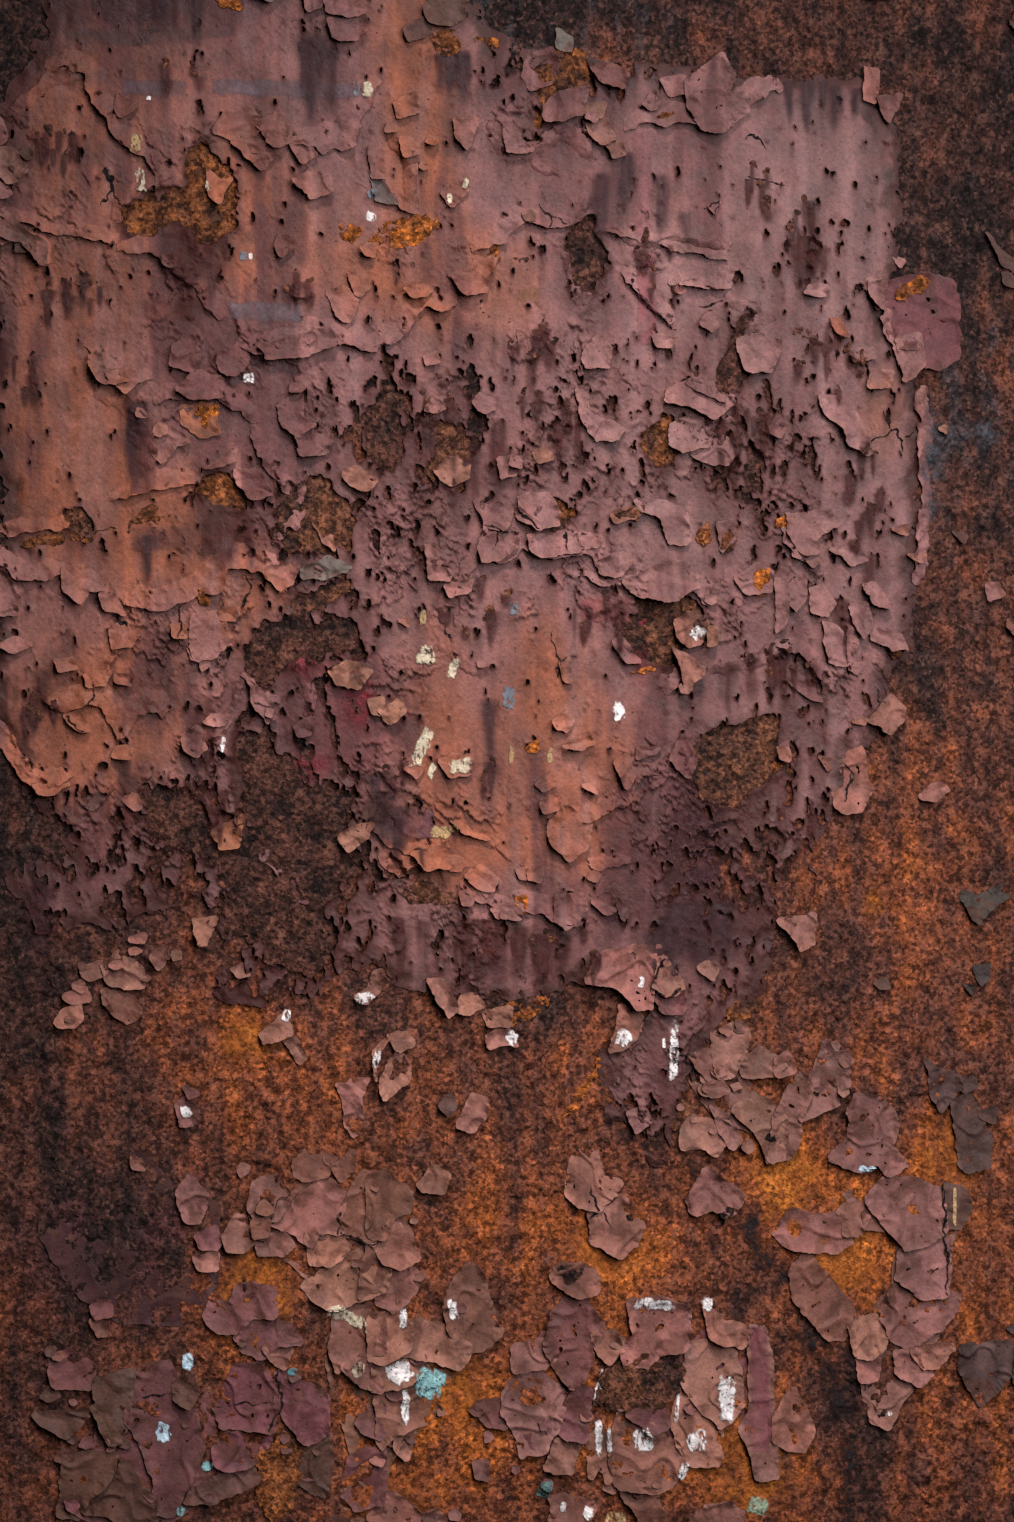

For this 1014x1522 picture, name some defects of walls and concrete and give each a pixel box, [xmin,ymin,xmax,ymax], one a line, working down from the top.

corrosion [121,142,239,254]
corrosion [633,413,685,466]
corrosion [716,313,770,484]
corrosion [243,472,367,687]
peeling [0,0,962,1167]
corrosion [581,596,703,674]
corrosion [125,702,457,978]
corrosion [692,712,795,809]
peeling [924,1058,998,1174]
peeling [31,1031,816,1522]
peeling [771,1092,1014,1431]
corrosion [594,1353,687,1413]